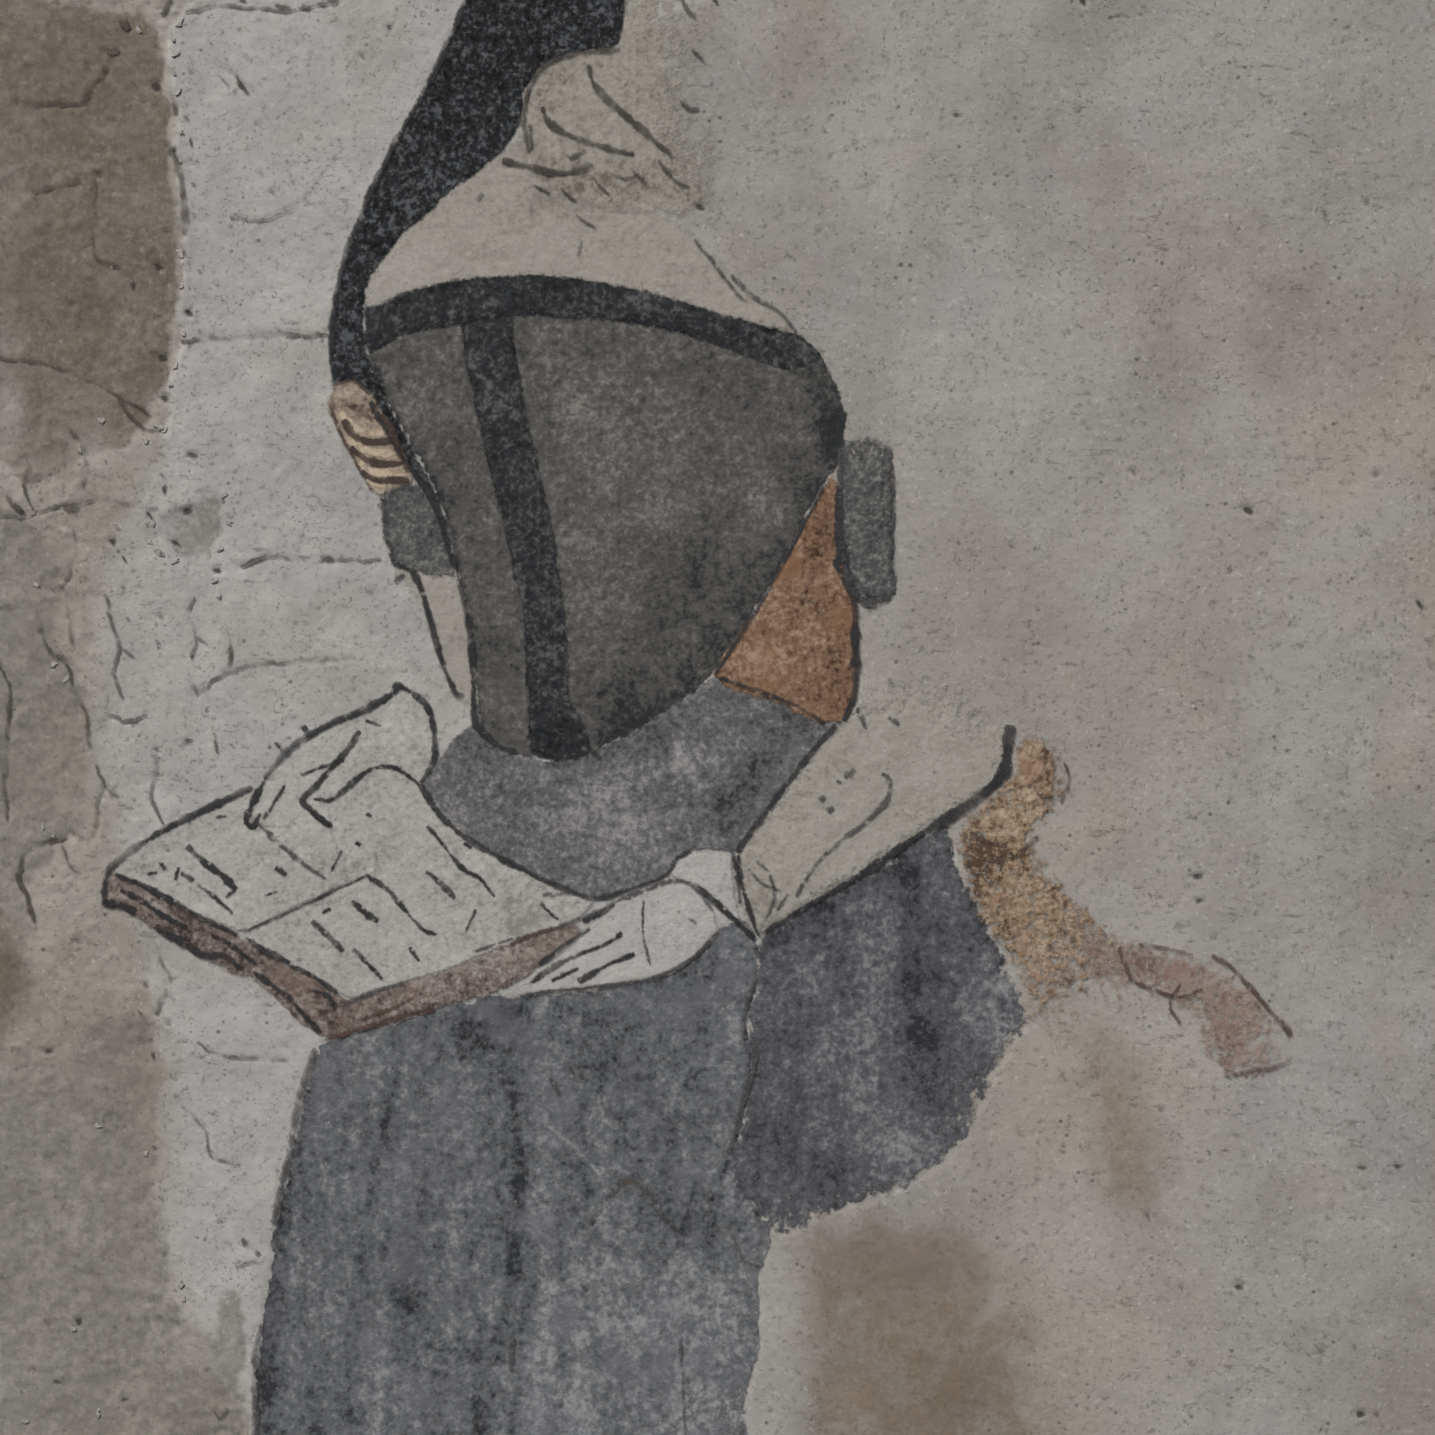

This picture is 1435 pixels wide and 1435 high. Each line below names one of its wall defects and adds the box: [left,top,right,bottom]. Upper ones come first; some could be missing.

crack [37,0,336,108]
crack [170,94,188,234]
spalling [0,0,200,454]
crack [0,355,157,431]
crack [2,481,92,519]
spalling [145,491,233,600]
crack [240,555,381,568]
crack [188,596,286,695]
crack [0,664,12,737]
crack [44,594,163,825]
crack [15,837,76,922]
water stain [829,1256,1009,1435]